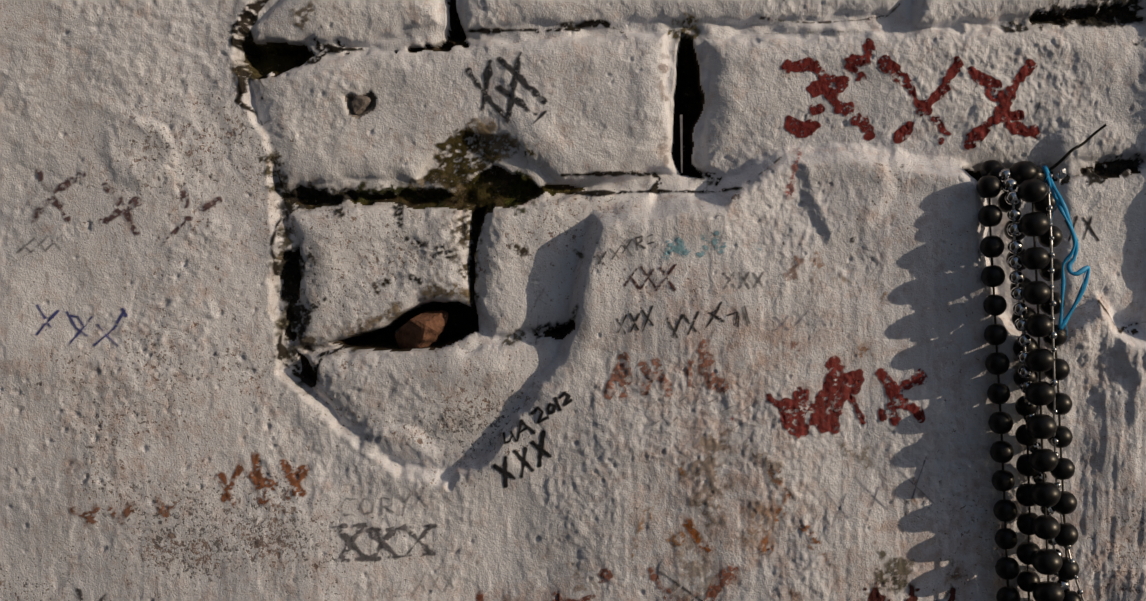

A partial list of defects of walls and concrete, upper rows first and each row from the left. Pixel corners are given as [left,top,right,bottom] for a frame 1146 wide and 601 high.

mould [1001,0,1144,32]
damp [467,119,535,162]
damp [1056,153,1144,185]
damp [505,170,536,215]
damp [279,175,469,262]
spalling [239,0,1146,480]
damp [409,274,474,300]
damp [278,252,330,384]
damp [347,303,407,352]
damp [502,305,578,346]